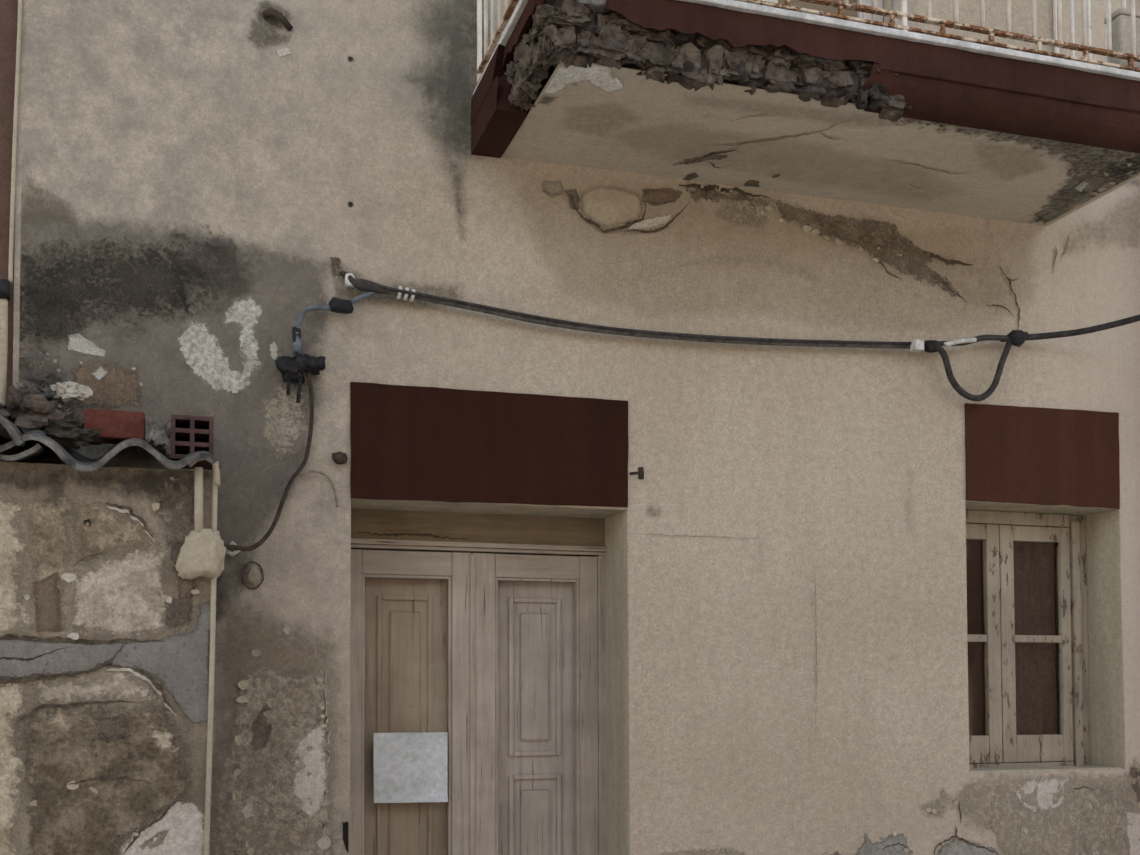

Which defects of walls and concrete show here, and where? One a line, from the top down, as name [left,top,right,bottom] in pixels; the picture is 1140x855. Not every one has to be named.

leakage [425,0,484,171]
spalling [504,0,912,122]
crack [679,183,770,209]
leakage [902,118,1140,224]
flaking render [178,297,278,393]
flaking render [0,476,200,640]
leakage [19,187,341,855]
crack [0,634,176,716]
spalling [0,649,349,855]
peeling [924,762,1140,855]